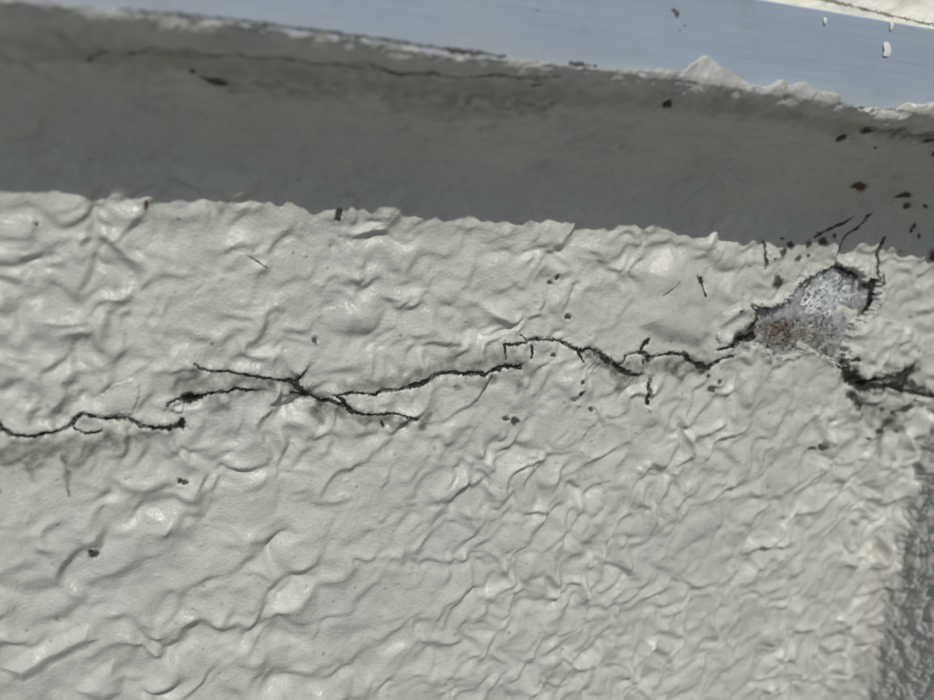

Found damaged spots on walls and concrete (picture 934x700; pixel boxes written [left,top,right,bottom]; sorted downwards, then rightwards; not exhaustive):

spalling [715,264,926,380]
crack [0,332,751,438]
crack [831,353,934,398]